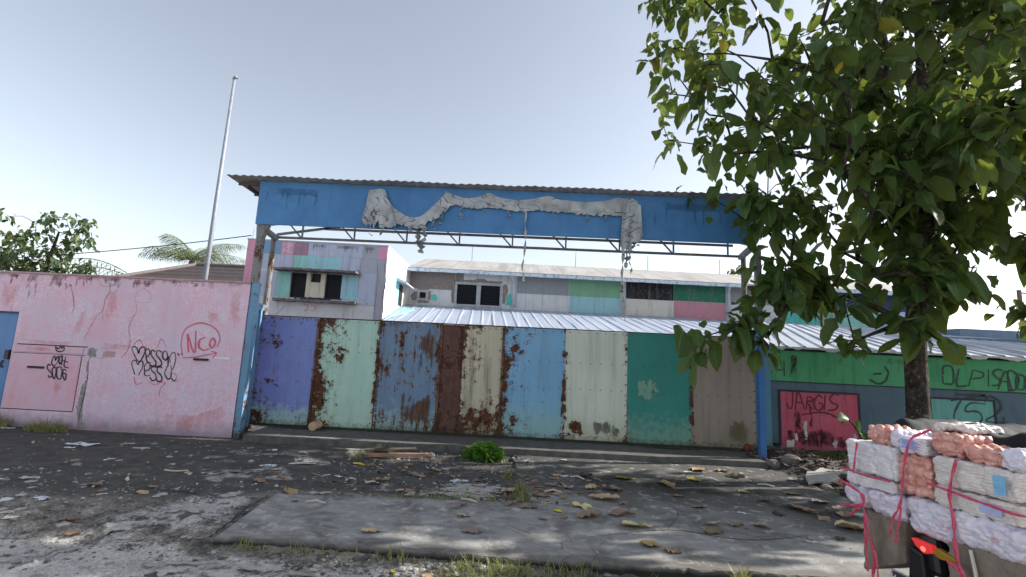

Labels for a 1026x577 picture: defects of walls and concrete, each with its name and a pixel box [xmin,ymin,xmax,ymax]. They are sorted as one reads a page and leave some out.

corrosion [312,332,347,422]
corrosion [371,321,382,421]
corrosion [393,393,430,425]
corrosion [418,329,438,371]
corrosion [460,381,516,431]
corrosion [560,351,619,437]
peeling [637,380,658,401]